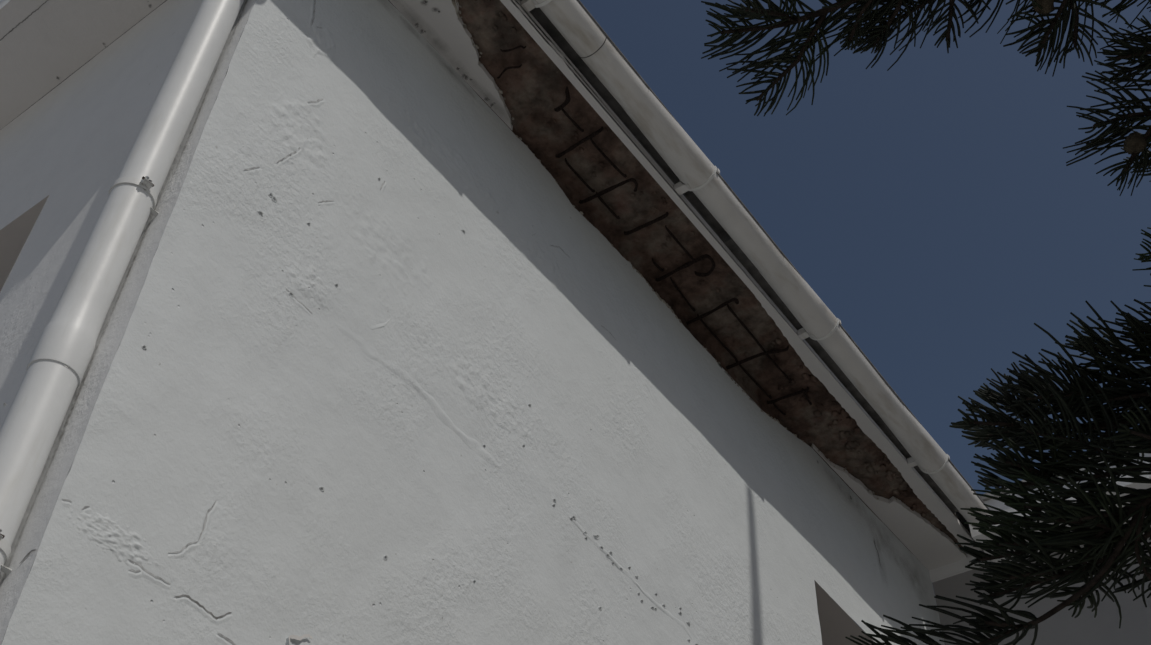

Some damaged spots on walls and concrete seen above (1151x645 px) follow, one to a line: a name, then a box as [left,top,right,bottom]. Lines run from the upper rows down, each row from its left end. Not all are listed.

spalling [452,0,971,547]
crack [127,501,237,645]